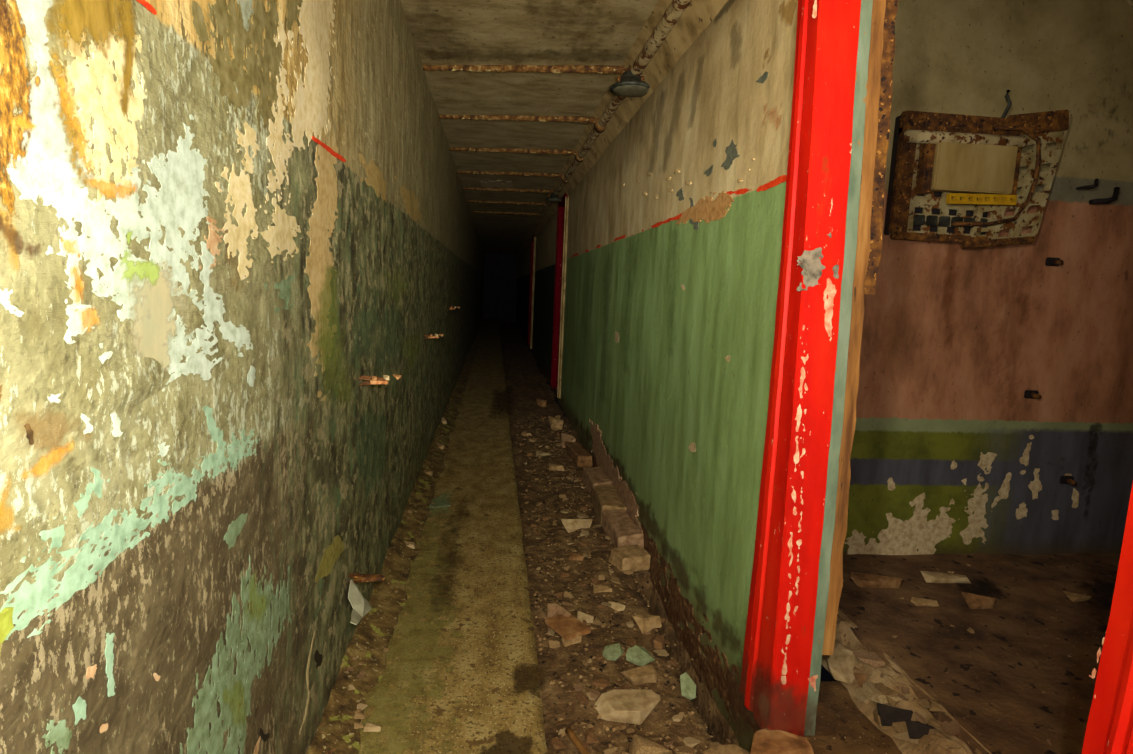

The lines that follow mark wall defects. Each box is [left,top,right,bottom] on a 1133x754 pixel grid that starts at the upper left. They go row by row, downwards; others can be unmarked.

corrosion [0,0,41,255]
peeling [7,0,338,401]
peeling [676,187,734,230]
peeling [704,138,740,176]
peeling [0,285,24,317]
peeling [0,406,262,656]
peeling [781,325,809,685]
peeling [845,435,1042,555]
peeling [1065,473,1079,508]
peeling [86,632,116,697]
peeling [180,555,292,754]
peeling [42,696,87,754]